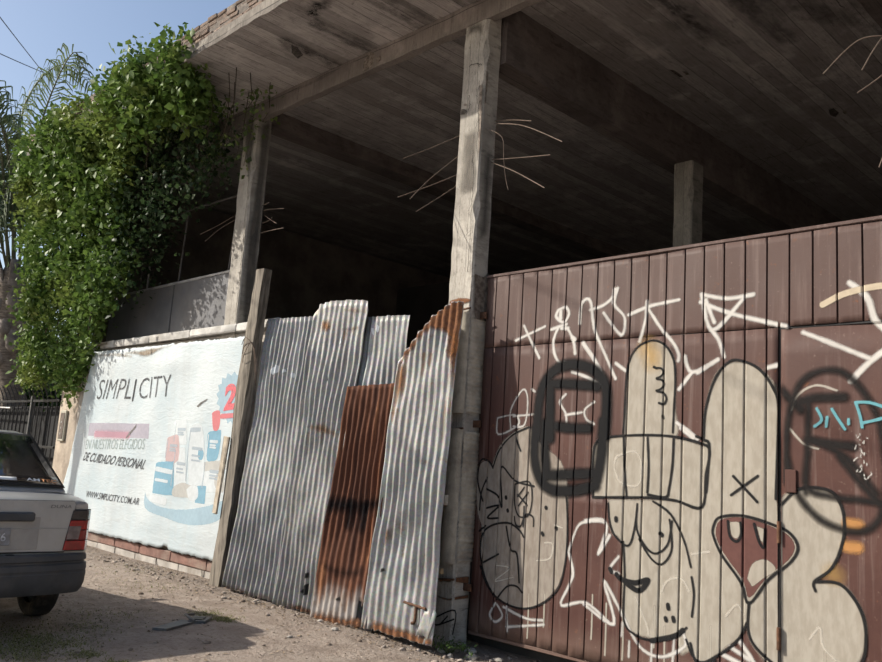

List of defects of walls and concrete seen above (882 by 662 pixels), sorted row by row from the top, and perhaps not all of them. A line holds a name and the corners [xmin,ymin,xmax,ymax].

rust [396,298,470,399]